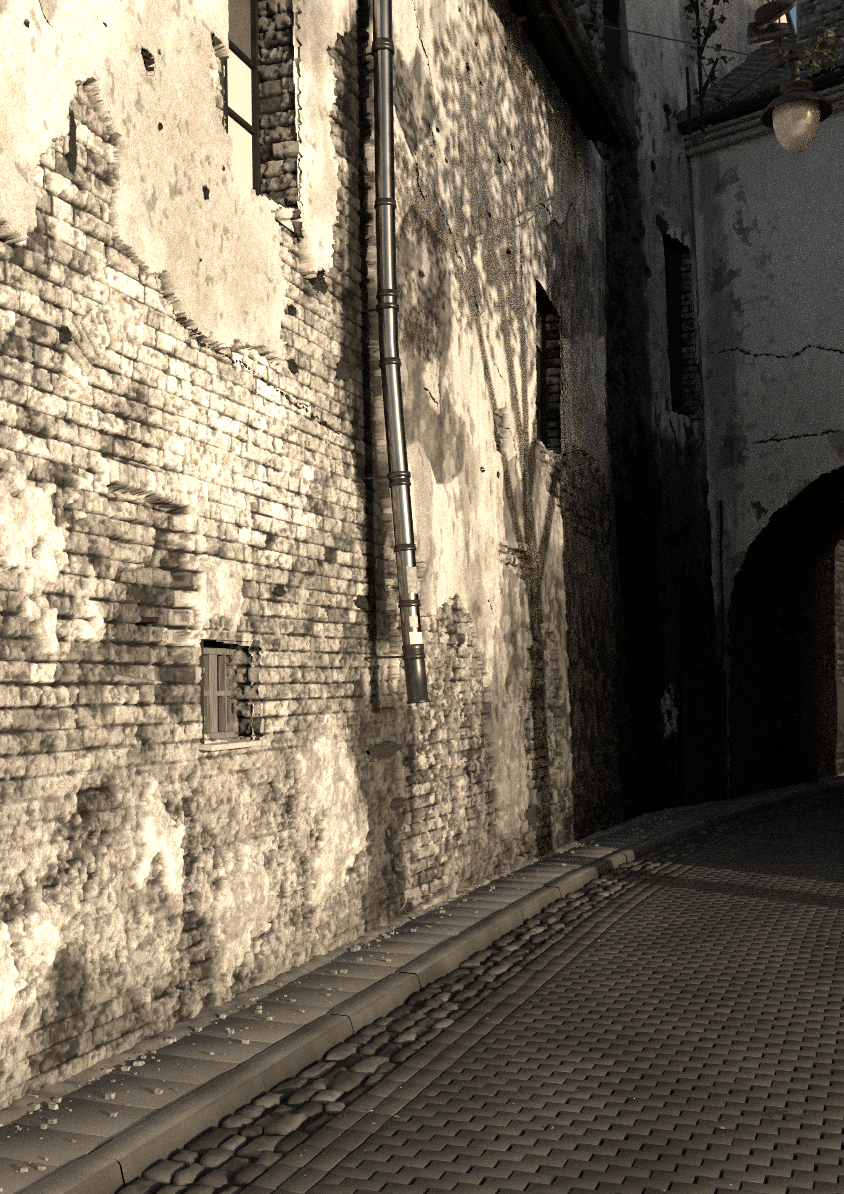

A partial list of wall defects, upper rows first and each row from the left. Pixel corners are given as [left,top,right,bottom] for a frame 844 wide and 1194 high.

water stain [459,0,606,264]
water stain [619,0,642,161]
crack [712,345,844,358]
peeling [713,419,749,474]
crack [753,429,842,444]
spalling [0,0,692,1110]
water stain [484,278,625,843]
water stain [479,858,531,886]